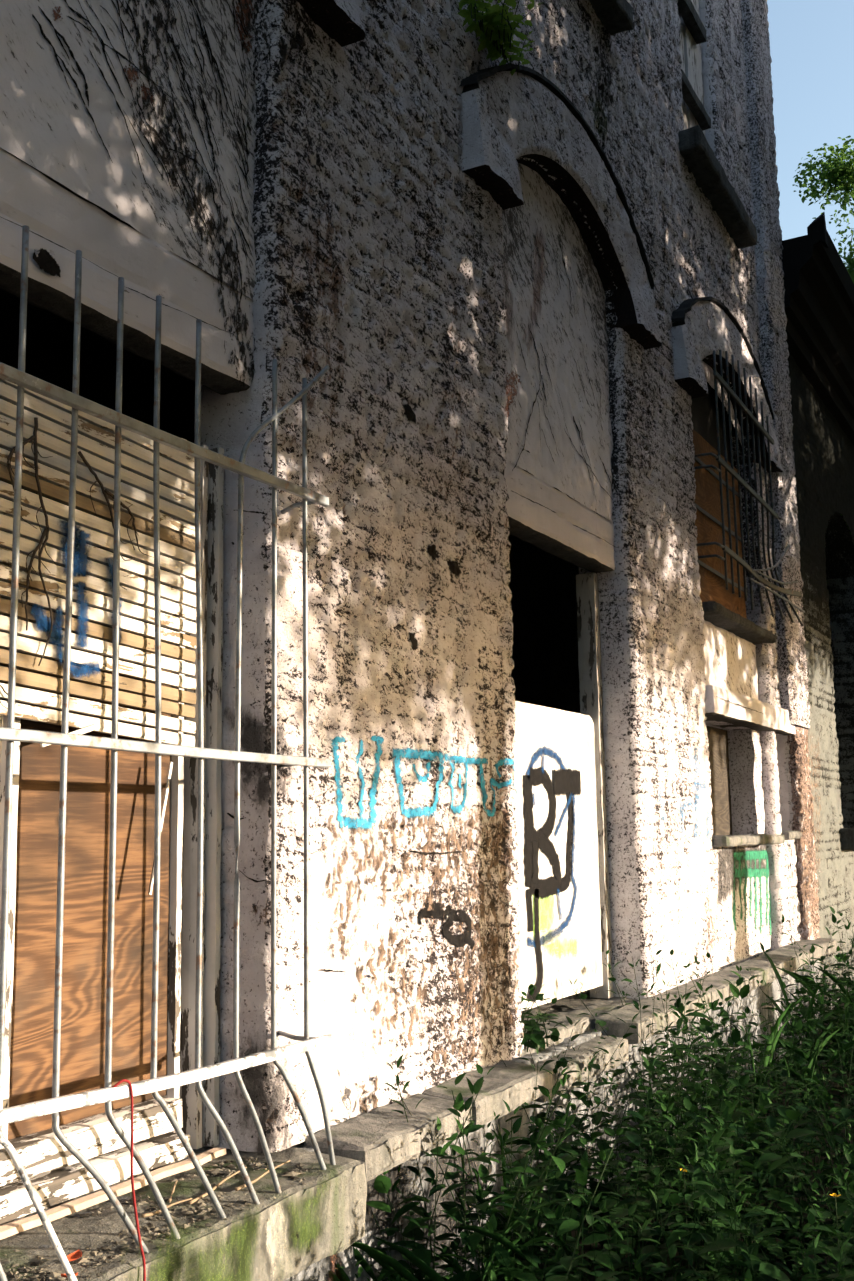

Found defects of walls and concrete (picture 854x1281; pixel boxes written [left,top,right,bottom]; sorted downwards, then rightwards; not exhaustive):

crack [38,0,235,289]
leakage [150,1213,259,1281]
leakage [288,1180,331,1252]